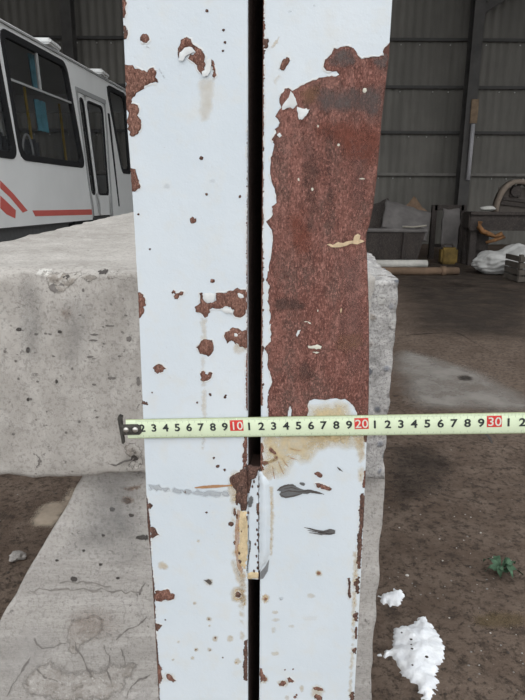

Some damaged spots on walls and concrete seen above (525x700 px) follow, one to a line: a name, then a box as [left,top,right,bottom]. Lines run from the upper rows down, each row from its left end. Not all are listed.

peeling [177,35,211,77]
corrosion [195,337,214,357]
corrosion [315,407,344,416]
corrosion [195,437,269,579]
corrosion [346,471,366,600]
crack [31,581,145,595]
corrosion [146,496,177,700]
corrosion [351,611,359,654]
crack [7,617,147,696]